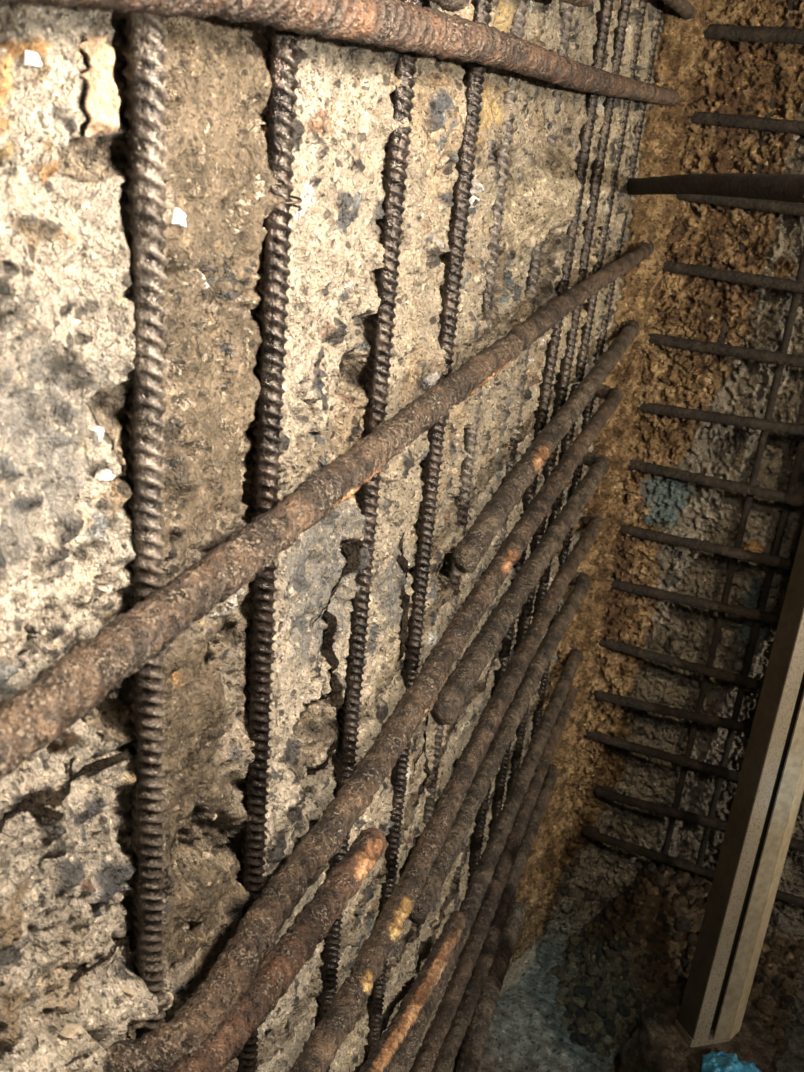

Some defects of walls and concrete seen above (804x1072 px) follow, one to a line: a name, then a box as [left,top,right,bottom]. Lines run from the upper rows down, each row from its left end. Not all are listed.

corrosion [493,0,519,33]
corrosion [0,40,51,106]
corrosion [80,36,120,138]
corrosion [476,85,509,142]
corrosion [40,162,58,185]
spalling [0,0,804,520]
spalling [0,11,654,915]
crack [302,541,362,780]
spalling [0,384,623,1072]
crack [0,746,136,833]